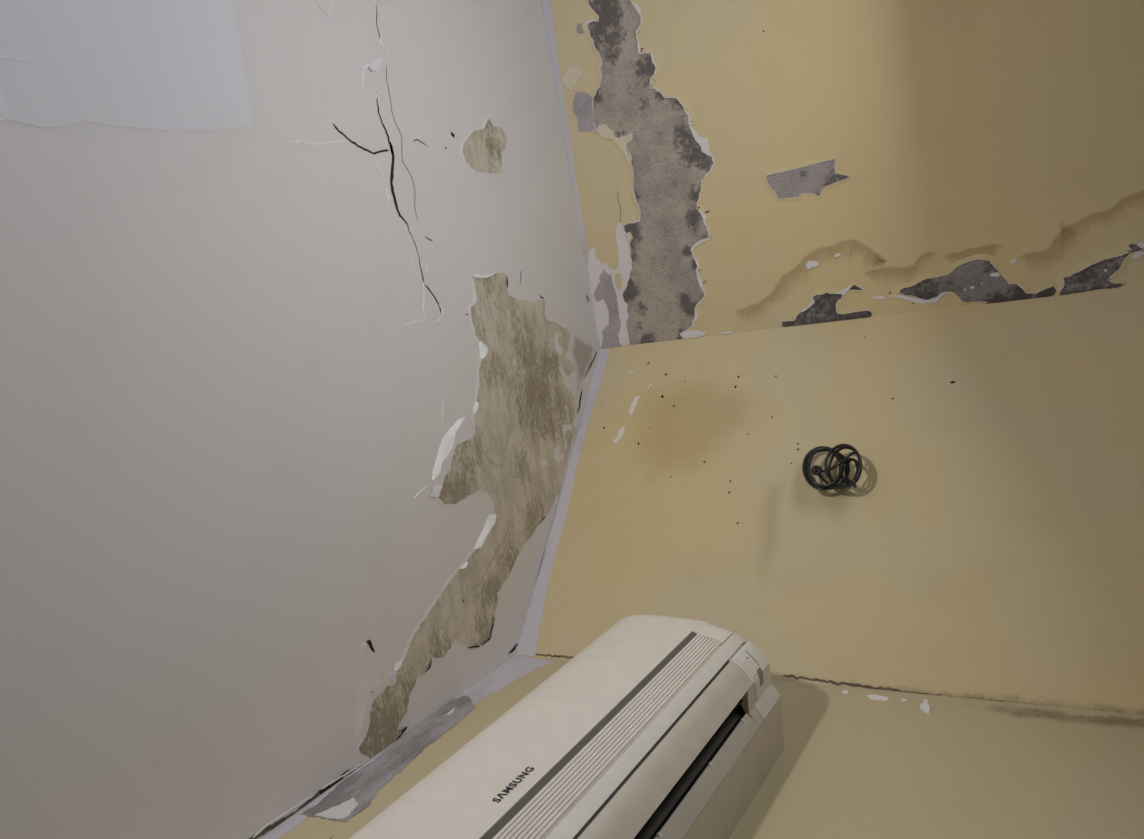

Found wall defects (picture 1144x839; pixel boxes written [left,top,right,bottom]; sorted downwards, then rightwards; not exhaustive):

crack [290,0,443,327]
peeling [445,114,508,177]
flaking render [573,0,718,348]
peeling [762,155,854,203]
flaking render [778,237,1144,327]
peeling [299,269,577,822]
crack [782,674,1036,705]